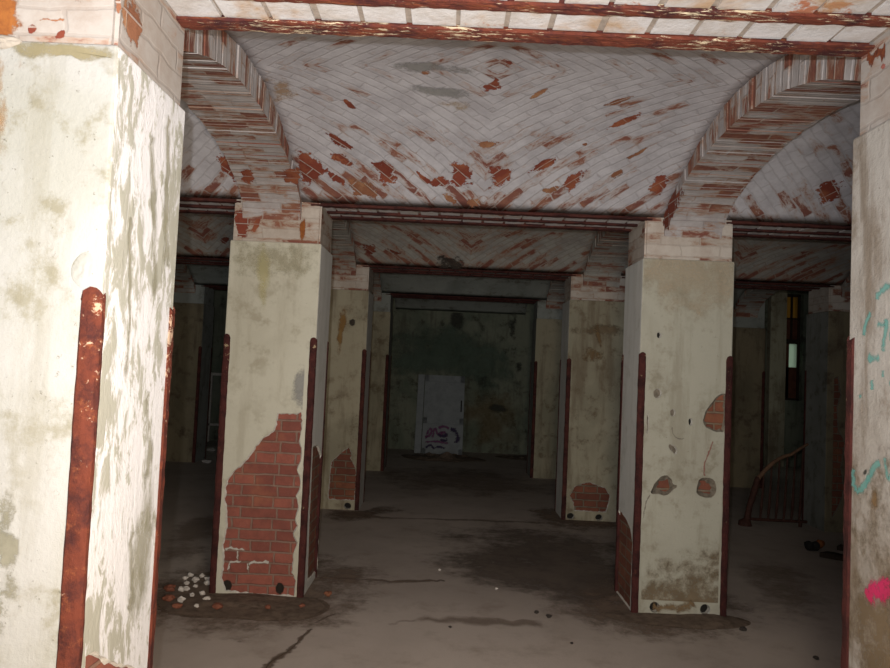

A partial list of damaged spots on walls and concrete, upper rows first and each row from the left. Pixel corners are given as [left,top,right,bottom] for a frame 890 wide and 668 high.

peeling [283,133,398,198]
peeling [416,161,481,207]
peeling [487,166,514,193]
peeling [527,157,556,174]
peeling [542,169,587,193]
peeling [648,174,684,230]
spalling [688,393,725,432]
spalling [220,412,302,597]
spalling [651,475,677,496]
spalling [696,478,717,498]
spalling [85,651,135,668]
crack [264,614,335,668]